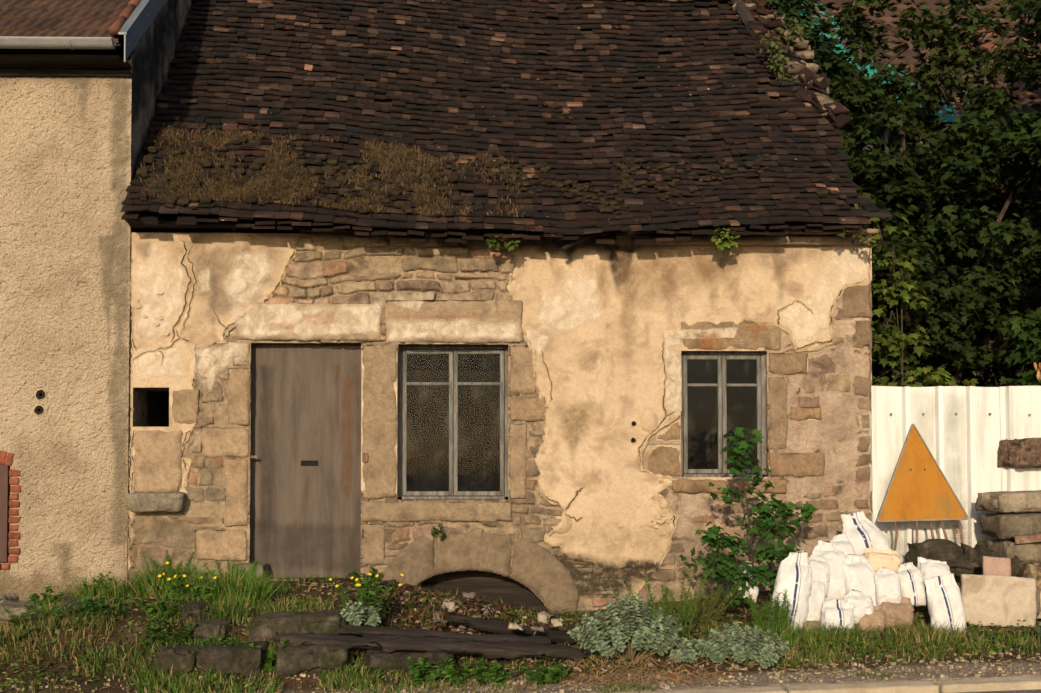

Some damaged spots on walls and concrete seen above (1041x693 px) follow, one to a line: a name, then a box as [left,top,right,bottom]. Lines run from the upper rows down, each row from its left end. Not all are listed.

crack [127,237,295,566]
peeling [127,233,872,612]
leakage [530,238,635,282]